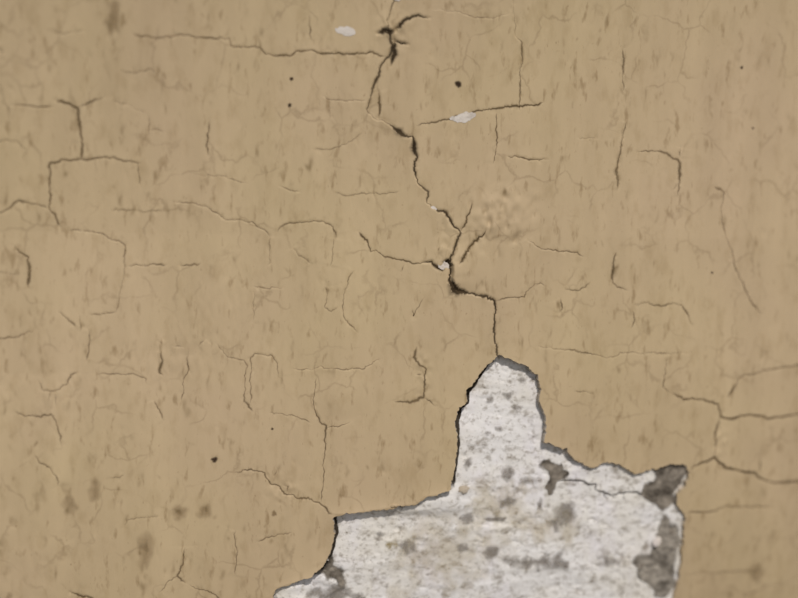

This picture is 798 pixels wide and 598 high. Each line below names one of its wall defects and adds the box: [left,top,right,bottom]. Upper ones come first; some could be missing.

crack [0,99,140,223]
crack [137,2,540,357]
crack [19,252,31,284]
crack [400,351,427,403]
crack [245,469,328,511]
peeling [273,355,689,598]
crack [561,480,641,498]
crack [663,382,798,483]